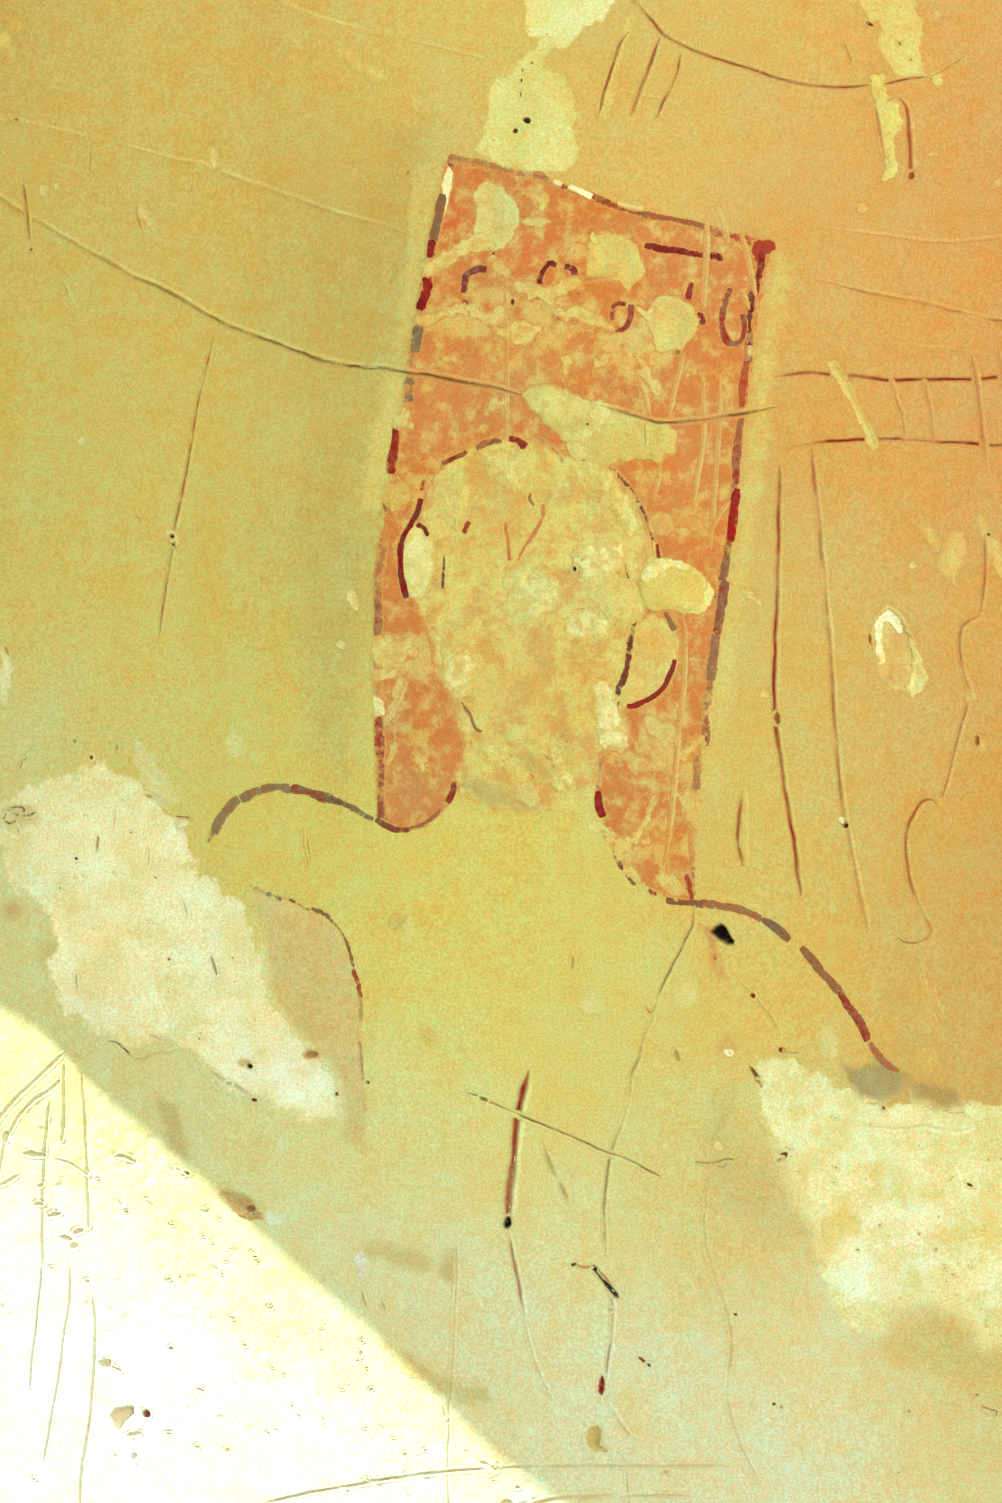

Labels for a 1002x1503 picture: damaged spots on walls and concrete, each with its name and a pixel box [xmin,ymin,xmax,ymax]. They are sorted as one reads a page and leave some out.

peeling [855,0,944,182]
peeling [413,0,701,397]
crack [0,192,523,397]
crack [590,400,777,446]
spalling [865,603,930,698]
flaking render [0,735,341,1131]
spalling [199,1234,260,1276]
flaking render [713,1025,1002,1337]
spalling [338,1339,375,1393]